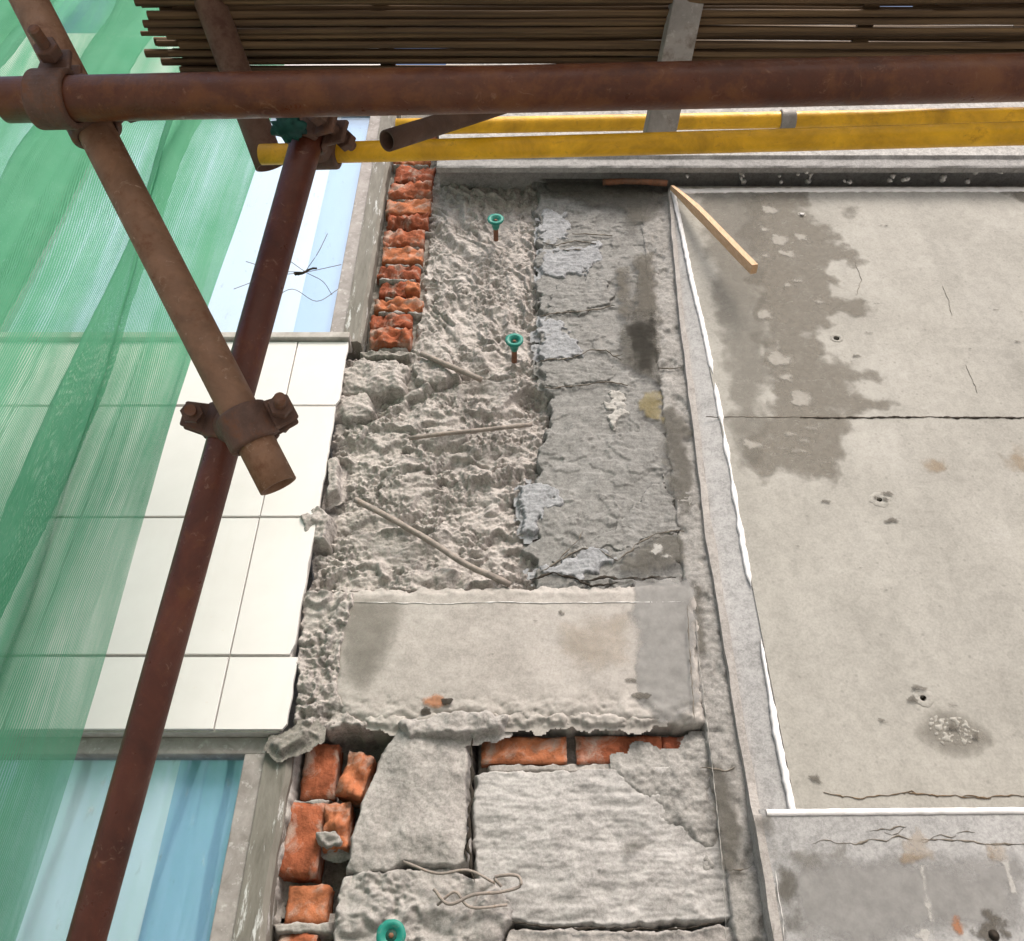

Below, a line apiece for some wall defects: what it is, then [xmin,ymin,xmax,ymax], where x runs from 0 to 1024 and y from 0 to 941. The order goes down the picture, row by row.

crack [543,233,612,251]
crack [539,305,615,317]
damp [617,253,664,420]
damp [703,192,889,477]
crack [540,349,628,389]
crack [706,413,1024,421]
spalling [264,161,684,941]
crack [824,790,1022,799]
crack [813,826,1024,846]